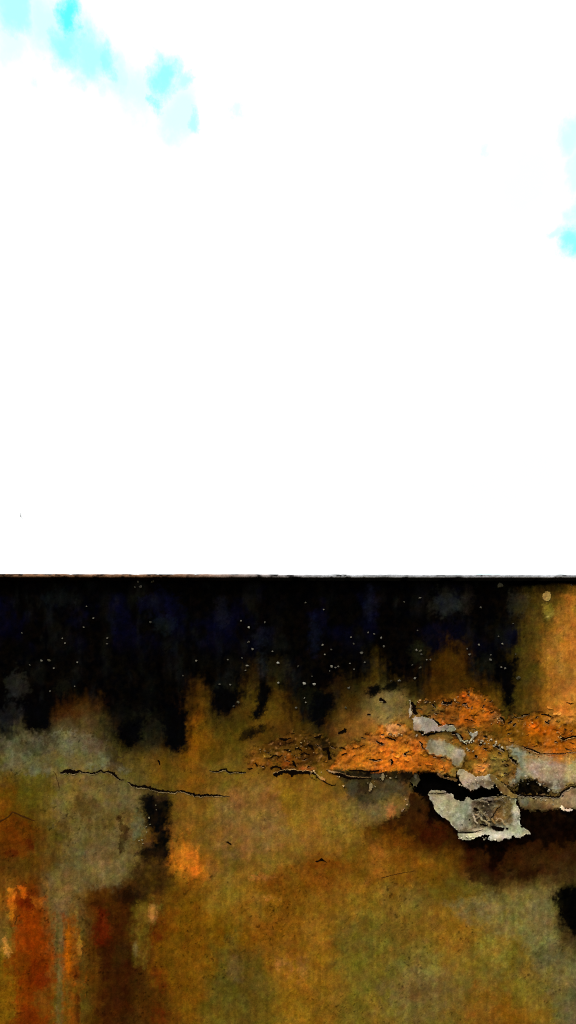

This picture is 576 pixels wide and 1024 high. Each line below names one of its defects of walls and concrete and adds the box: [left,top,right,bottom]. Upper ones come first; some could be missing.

rust [539,585,576,720]
rust [169,828,212,887]
crack [53,740,384,798]
damp [0,580,576,1024]
spalling [240,687,576,841]
rust [0,877,150,1024]